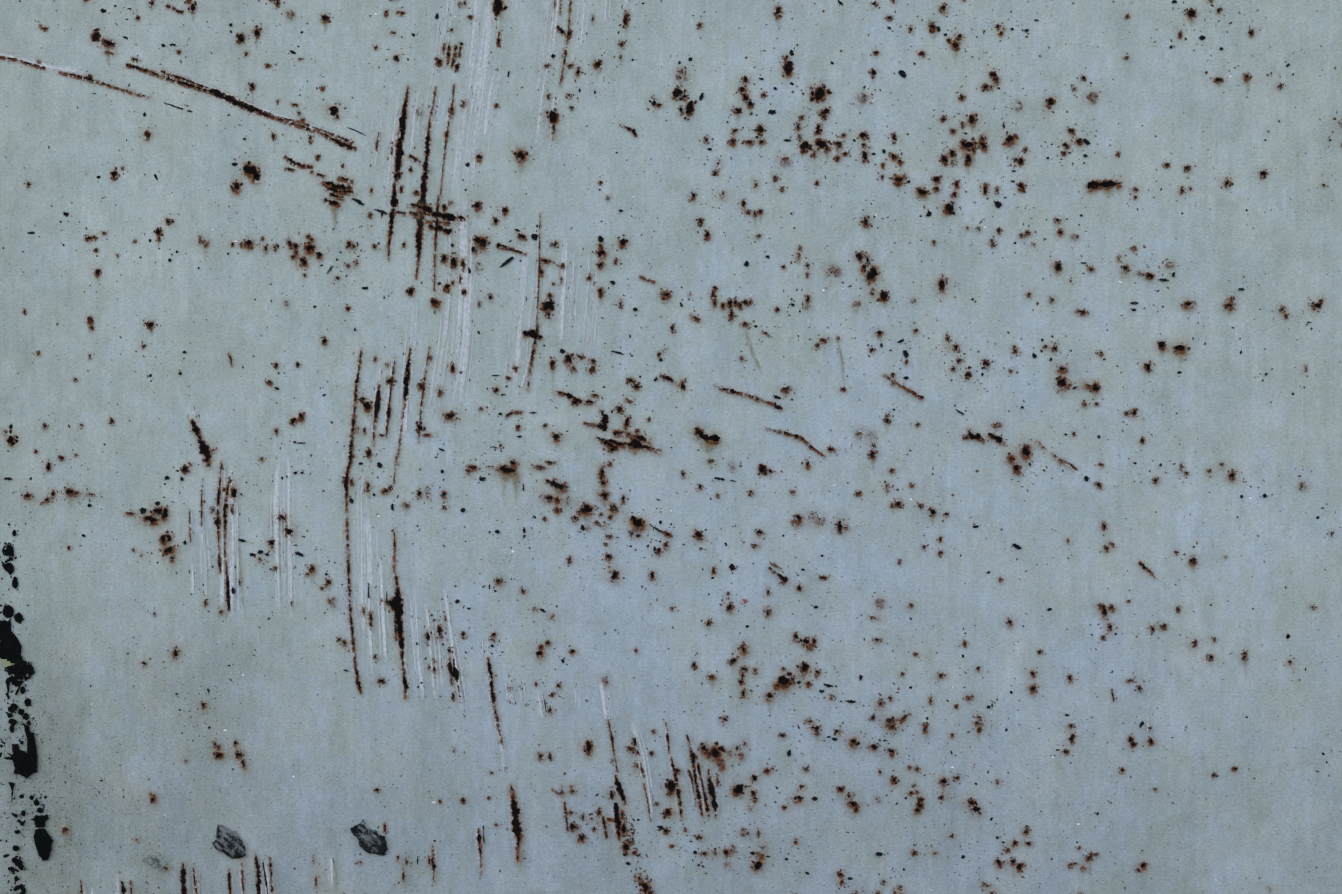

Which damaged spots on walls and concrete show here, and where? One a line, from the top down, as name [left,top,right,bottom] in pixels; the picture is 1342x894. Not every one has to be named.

rust [660,0,1211,428]
rust [1254,271,1340,332]
rust [676,426,878,500]
rust [829,468,962,565]
peeling [2,530,18,589]
rust [856,590,938,661]
rust [1090,588,1263,663]
rust [545,625,1040,894]
rust [228,856,273,894]
rust [1051,831,1099,872]